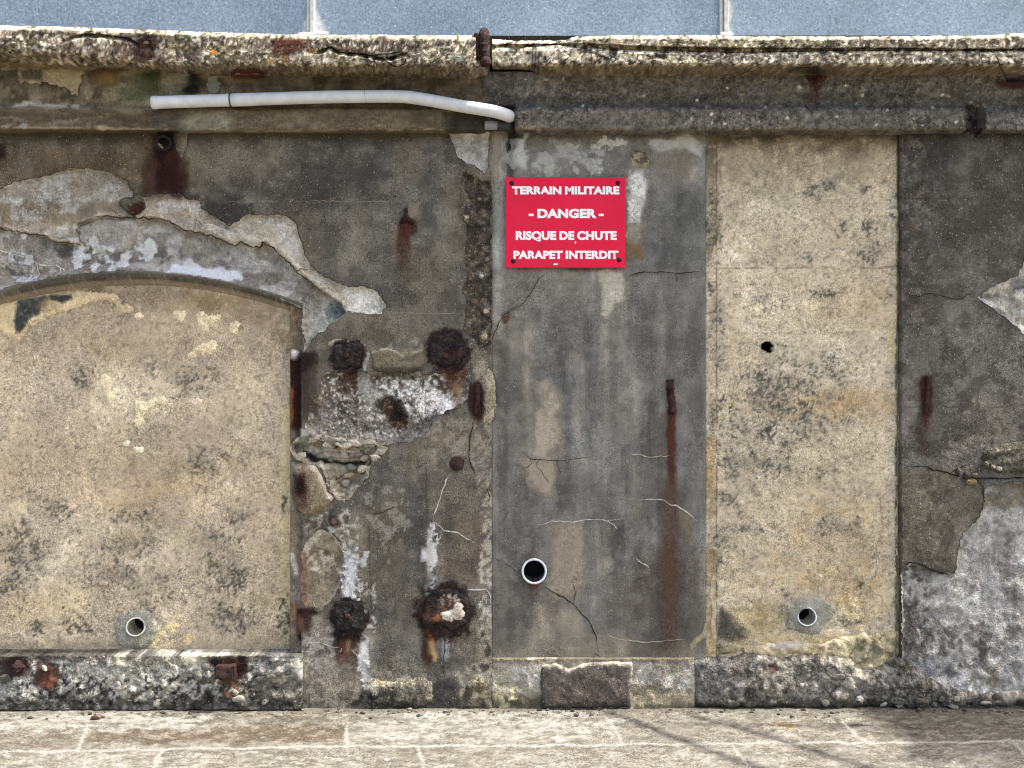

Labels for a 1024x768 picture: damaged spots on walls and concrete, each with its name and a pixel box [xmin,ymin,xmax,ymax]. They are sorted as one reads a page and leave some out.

spalling [0,168,386,358]
spalling [978,262,1024,333]
rust [289,339,367,432]
spalling [290,368,497,503]
rust [380,395,409,428]
rust [424,326,485,421]
crack [433,427,490,541]
crack [522,452,587,483]
crack [542,499,697,529]
rust [297,597,370,664]
crack [546,585,680,707]
spalling [717,482,1024,693]